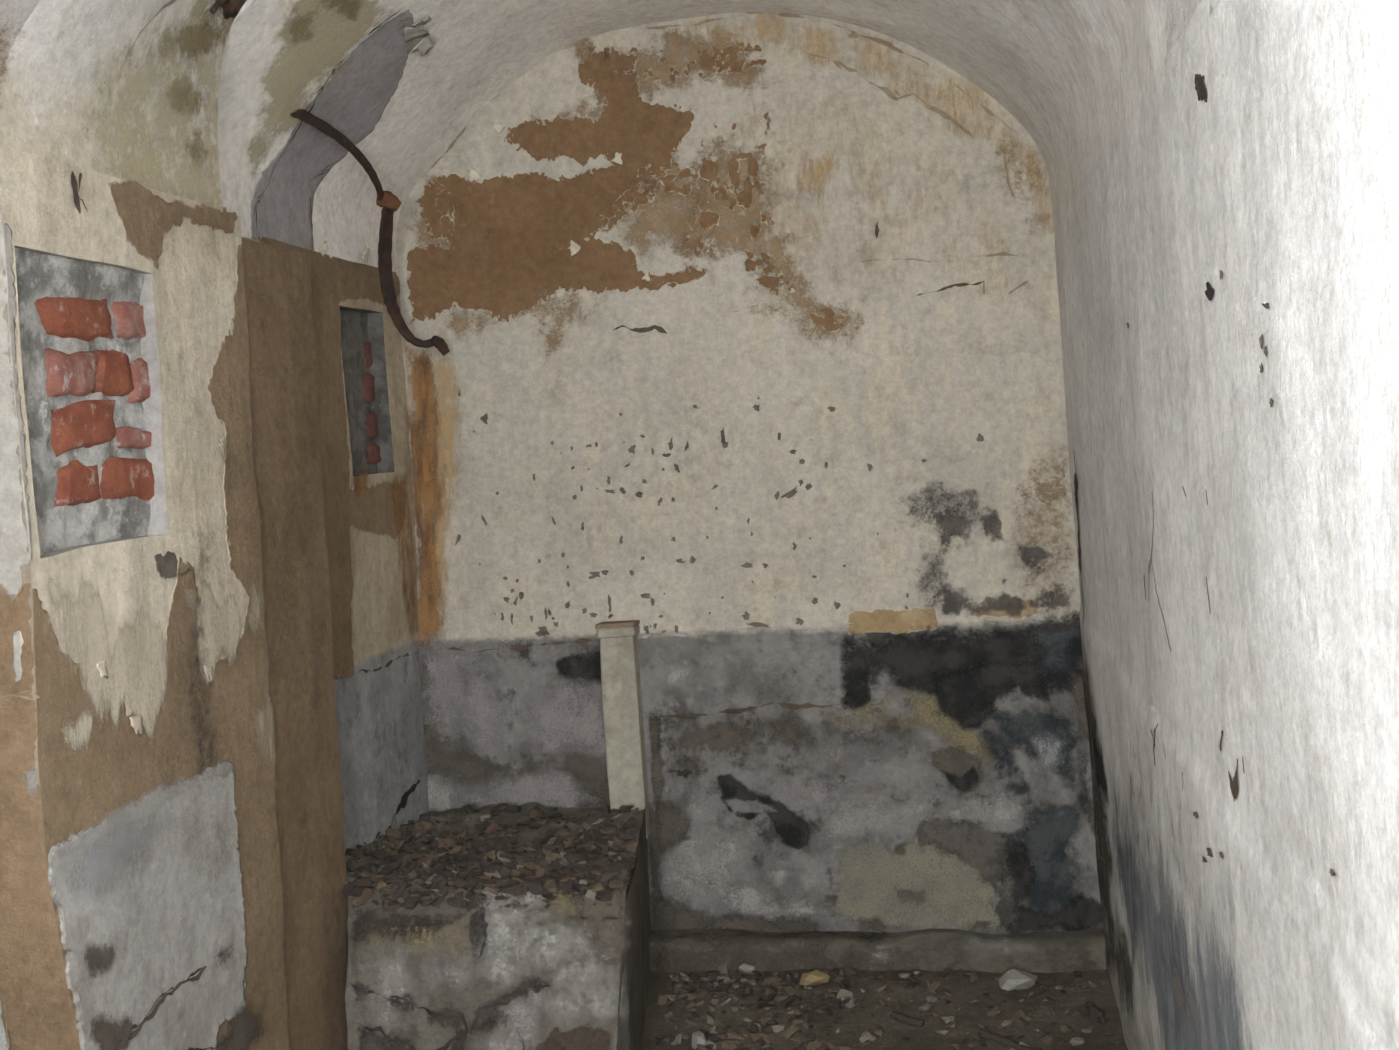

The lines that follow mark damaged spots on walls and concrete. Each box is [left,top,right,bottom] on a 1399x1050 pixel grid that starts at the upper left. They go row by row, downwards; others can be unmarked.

rust [392,348,458,646]
spalling [0,30,863,1050]
leakage [481,459,1242,1050]
leakage [352,911,462,1020]
crack [351,979,550,1050]
crack [469,902,488,960]